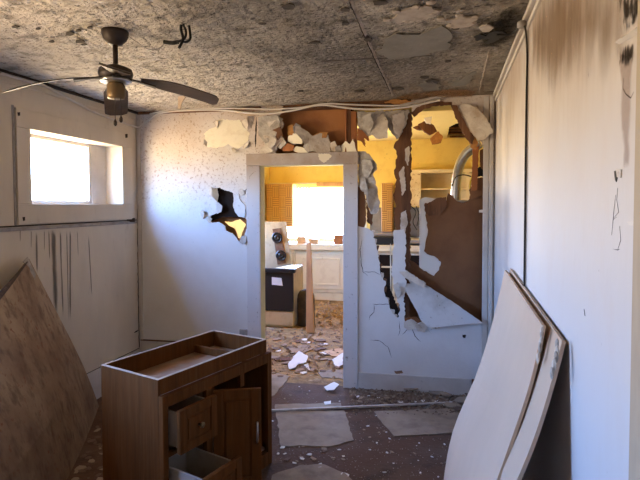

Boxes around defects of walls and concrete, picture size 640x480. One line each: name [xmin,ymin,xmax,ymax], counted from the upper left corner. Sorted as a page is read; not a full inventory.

peeling [376,0,459,60]
peeling [203,115,283,154]
peeling [413,116,443,145]
flaking render [200,187,247,223]
leakage [36,233,78,307]
peeling [404,317,441,332]